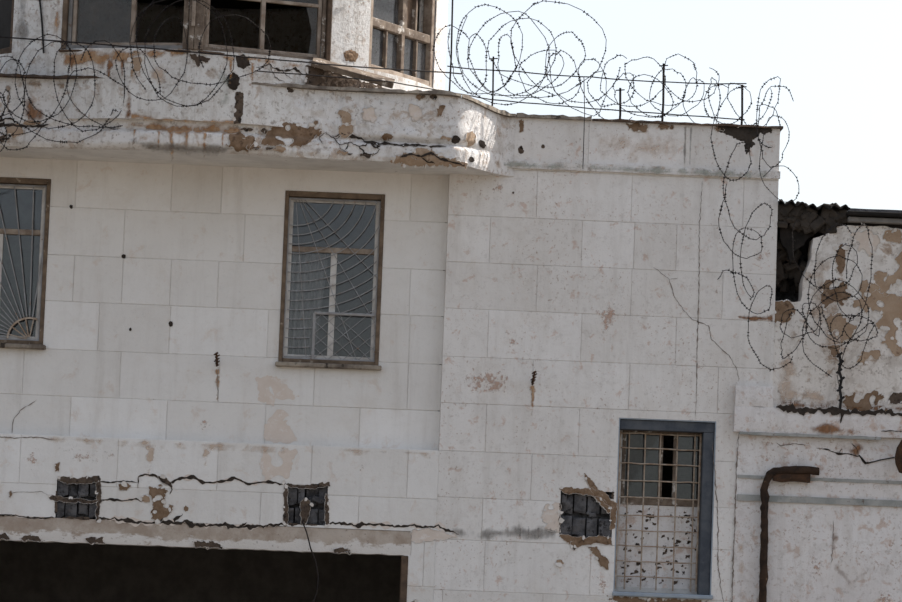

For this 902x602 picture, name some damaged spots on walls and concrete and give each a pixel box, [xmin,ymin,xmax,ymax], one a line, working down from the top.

spalling [225,108,325,154]
flaking render [819,227,902,366]
crack [1,401,54,440]
crack [776,403,902,432]
flaking render [842,390,902,411]
crack [777,443,872,464]
crack [0,492,54,520]
spalling [141,474,188,525]
crack [99,473,287,530]
spalling [541,494,567,533]
spalling [588,545,610,570]
peeling [621,508,697,585]